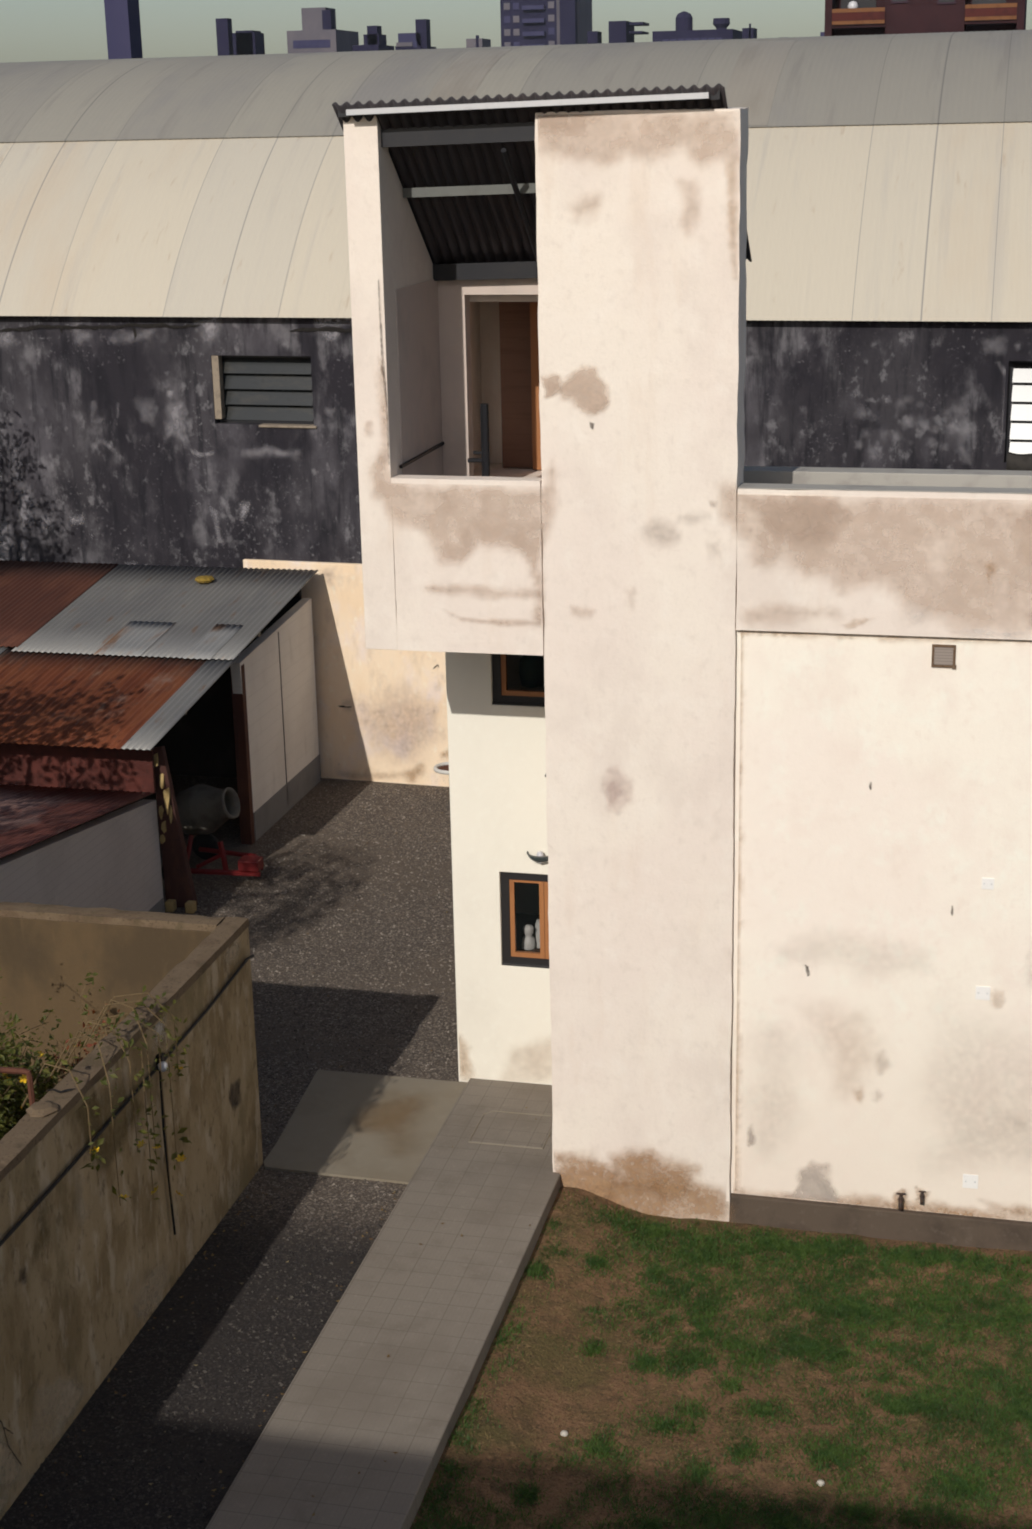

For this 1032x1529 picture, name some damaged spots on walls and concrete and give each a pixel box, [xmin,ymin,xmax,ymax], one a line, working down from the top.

damp [168,391,183,439]
damp [0,490,48,560]
damp [434,490,543,566]
damp [762,495,1032,618]
damp [558,1154,723,1219]